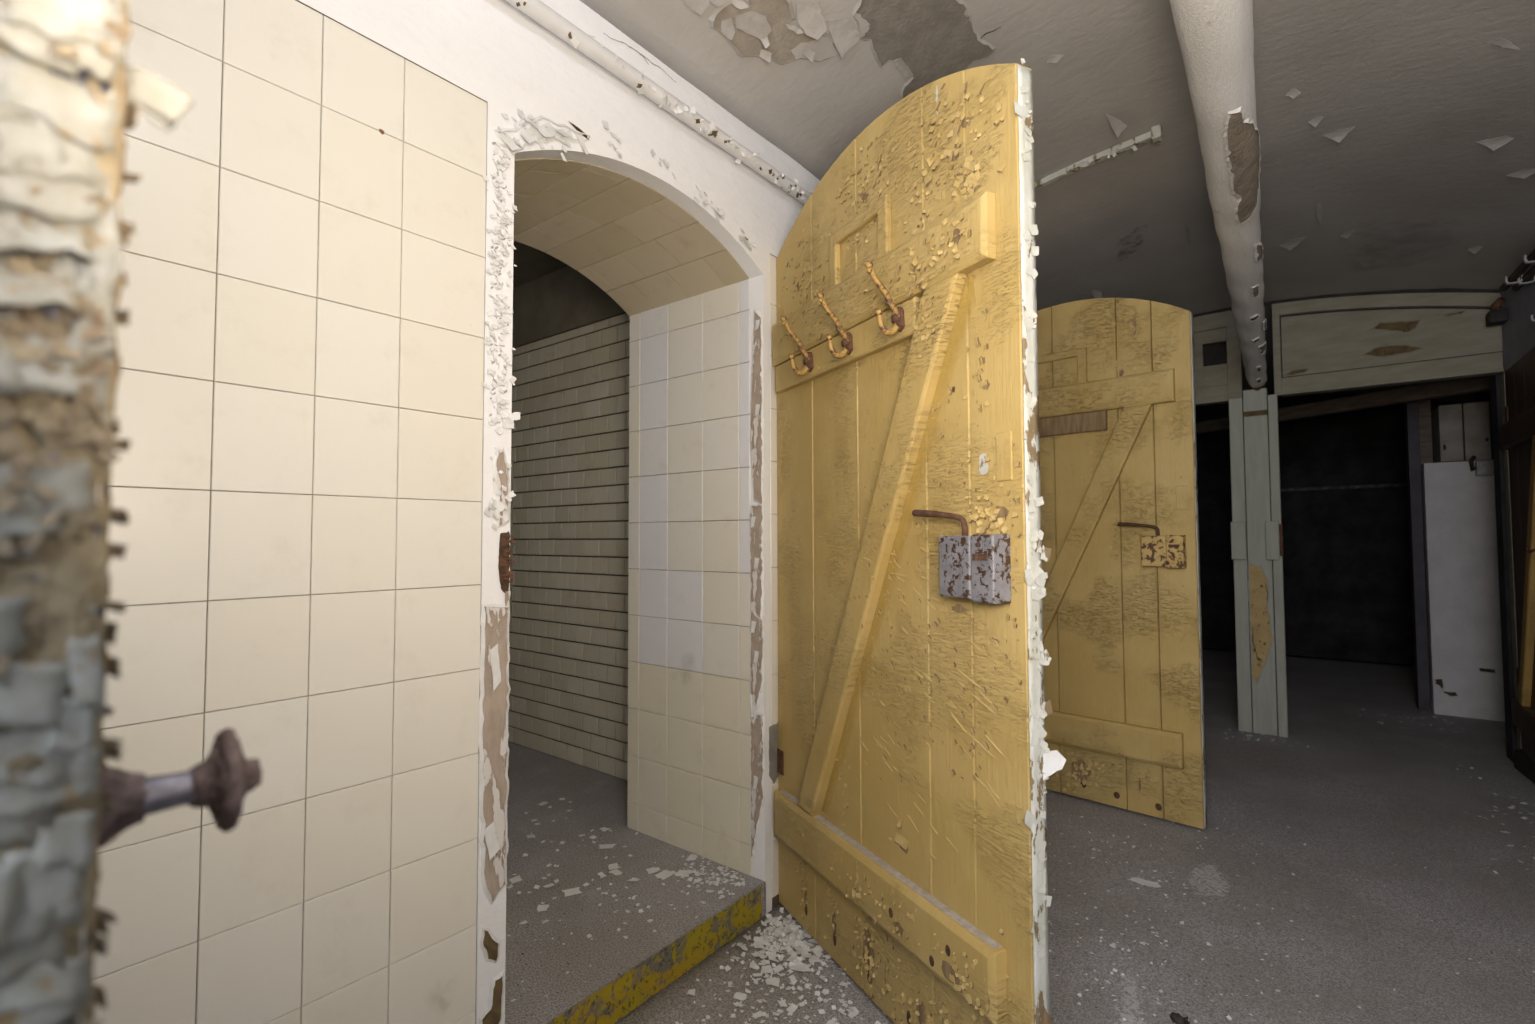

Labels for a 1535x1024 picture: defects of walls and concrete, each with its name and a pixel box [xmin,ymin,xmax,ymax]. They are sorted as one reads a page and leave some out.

peeling [1223,106,1261,224]
peeling [1023,201,1039,279]
peeling [115,309,130,326]
peeling [1022,305,1038,331]
peeling [683,0,1034,875]
peeling [110,508,130,525]
flaking render [478,108,623,905]
peeling [105,600,126,678]
peeling [782,354,1091,959]
peeling [102,738,124,761]
peeling [788,817,1012,1024]
flaking render [479,928,505,1024]